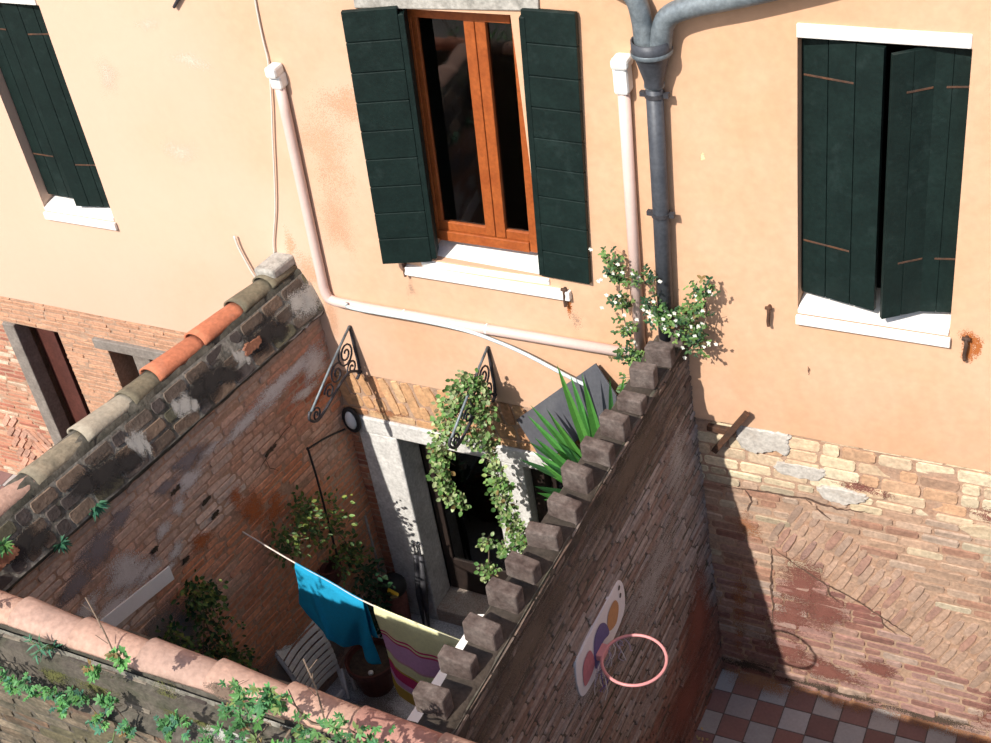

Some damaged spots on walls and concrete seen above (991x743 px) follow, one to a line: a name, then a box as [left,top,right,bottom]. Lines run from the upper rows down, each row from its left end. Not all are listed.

water stain [152,226,339,544]
corrosion [957,329,984,364]
water stain [65,429,153,499]
crack [721,485,870,520]
flaking render [736,426,869,505]
water stain [56,501,185,620]
water stain [724,553,991,733]